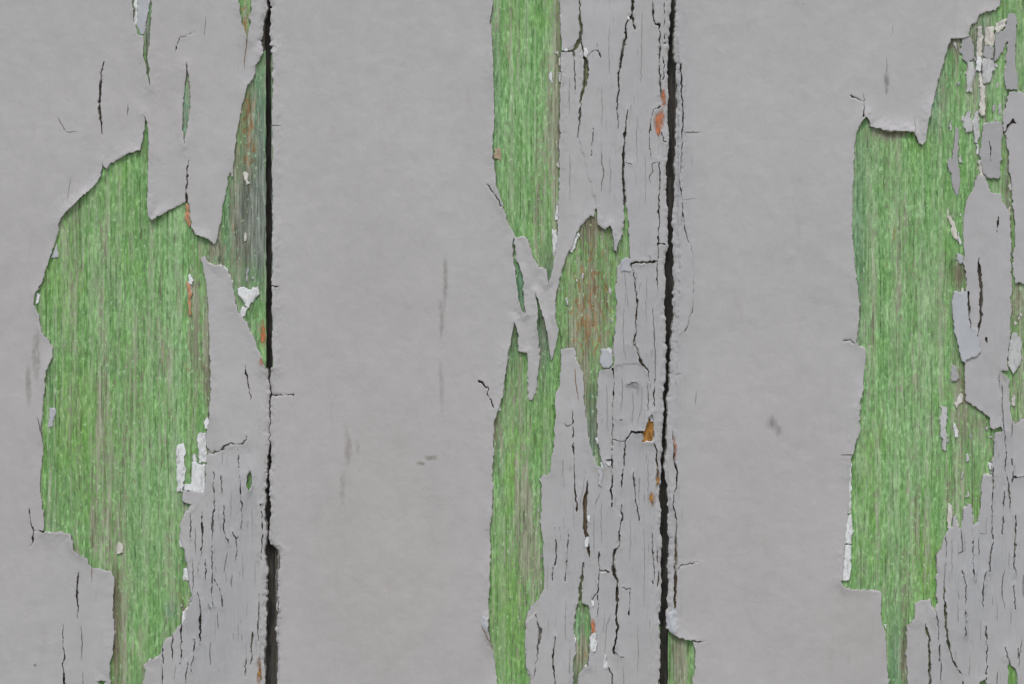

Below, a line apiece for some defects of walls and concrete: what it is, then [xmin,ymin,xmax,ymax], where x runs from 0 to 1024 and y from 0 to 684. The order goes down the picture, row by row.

crack [58,62,104,132]
corrosion [656,90,665,135]
peeling [33,50,273,684]
peeling [489,0,631,684]
crack [535,0,698,684]
peeling [841,0,1024,684]
crack [62,571,92,684]
crack [162,486,263,681]
crack [925,386,1024,684]